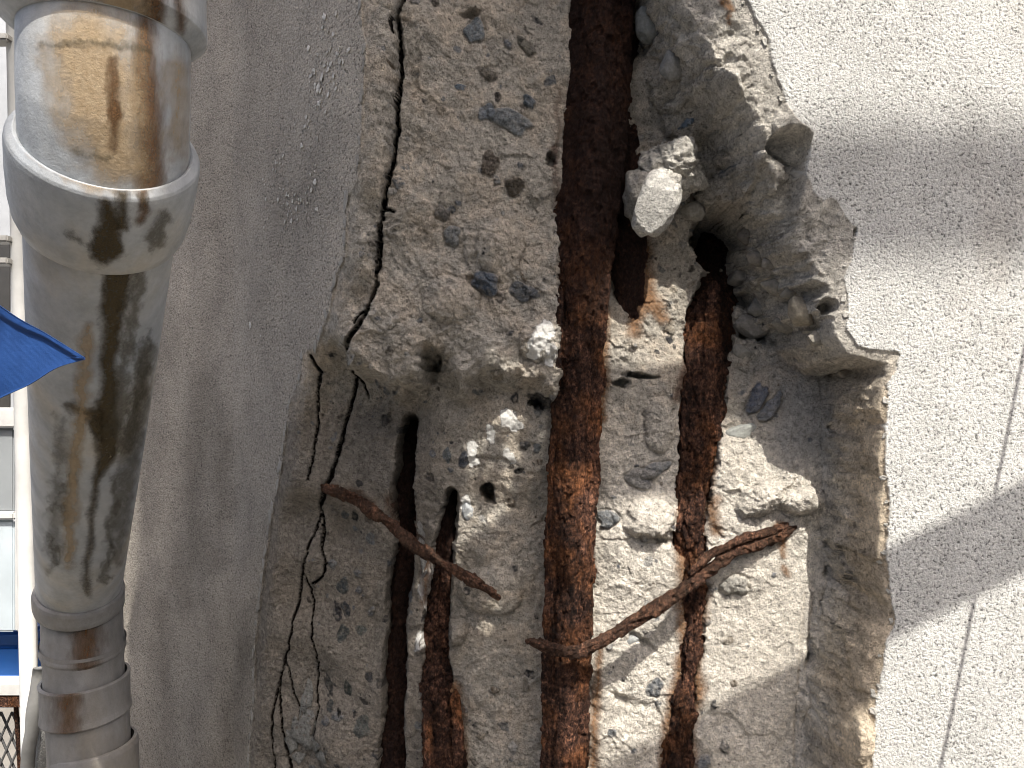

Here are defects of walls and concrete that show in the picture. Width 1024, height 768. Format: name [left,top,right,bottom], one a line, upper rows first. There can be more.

crack [271,0,406,768]
spalling [250,0,572,768]
rust [379,420,468,768]
rust [539,0,668,768]
rust [659,232,739,768]
spalling [587,0,899,768]
rust [779,538,789,576]